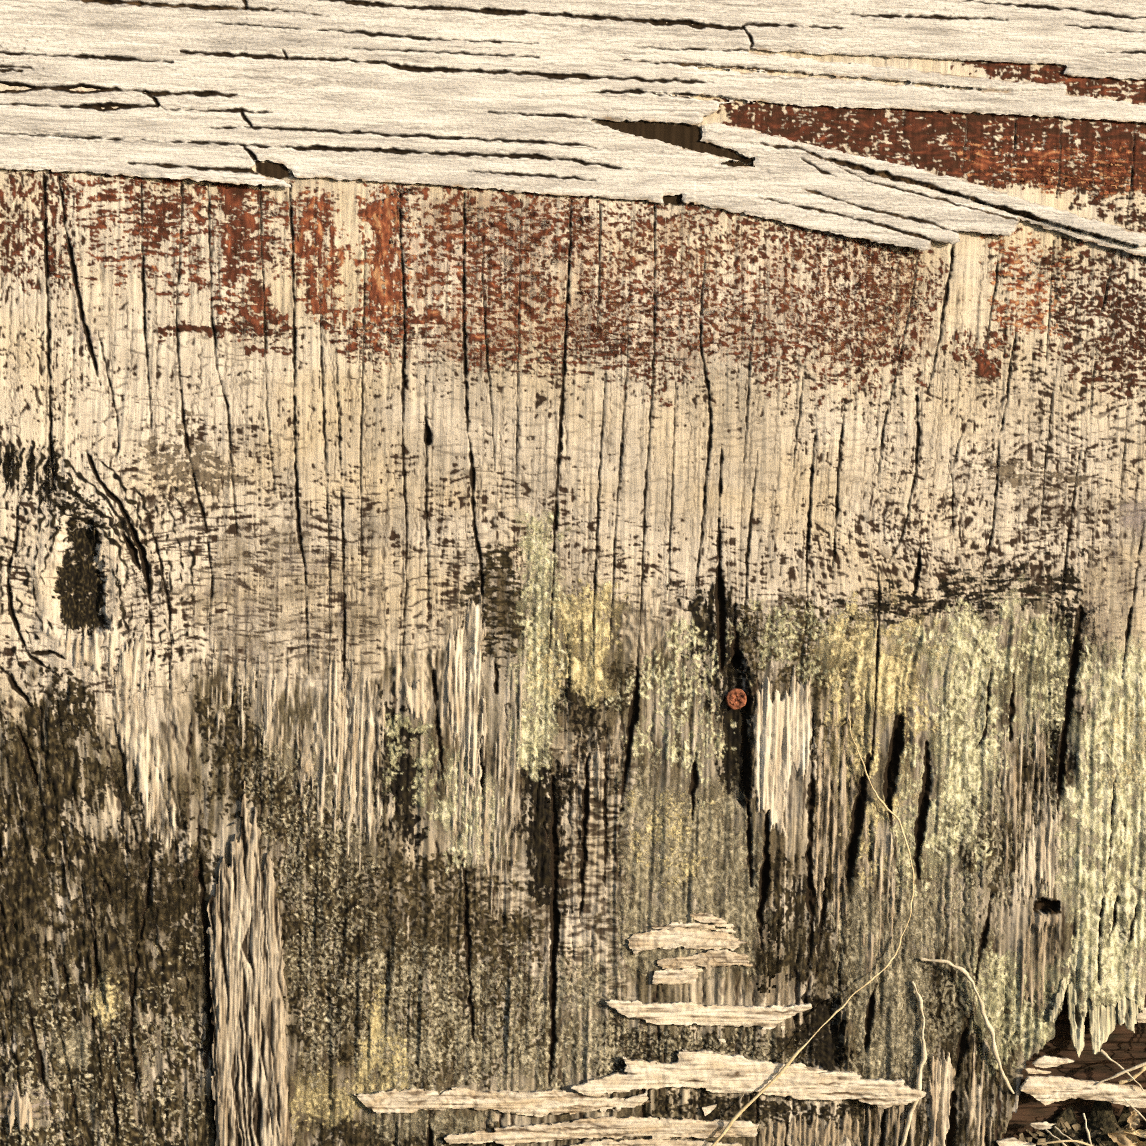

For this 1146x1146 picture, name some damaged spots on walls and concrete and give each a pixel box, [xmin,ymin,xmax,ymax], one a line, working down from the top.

spalling [255,160,293,180]
spalling [591,119,755,167]
crack [0,0,1146,696]
crack [0,506,66,786]
damp [454,532,551,681]
crack [548,206,758,1085]
crack [761,118,1136,985]
damp [0,650,643,1146]
peeling [627,912,753,985]
peeling [354,999,1036,1146]
damp [592,548,1116,1146]
peeling [1020,1055,1146,1108]